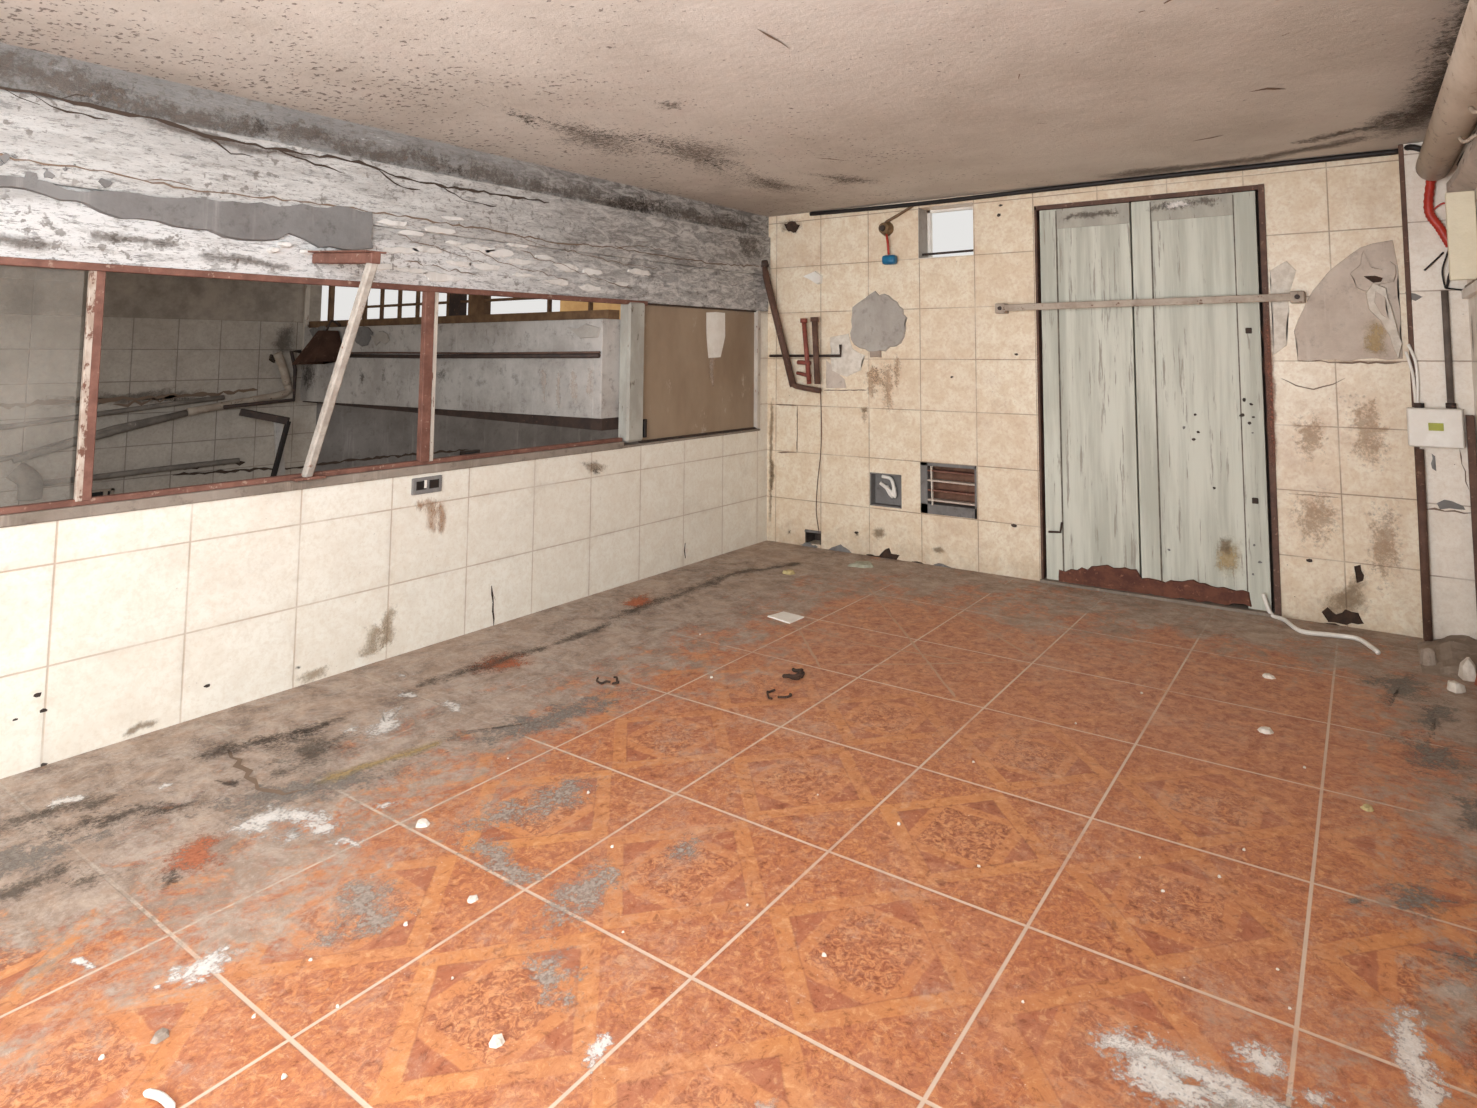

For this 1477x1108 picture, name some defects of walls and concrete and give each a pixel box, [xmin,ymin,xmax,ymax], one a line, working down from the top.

spalling [0,153,656,292]
water stain [0,51,748,231]
crack [0,86,759,267]
water stain [508,111,806,191]
water stain [1124,1,1469,175]